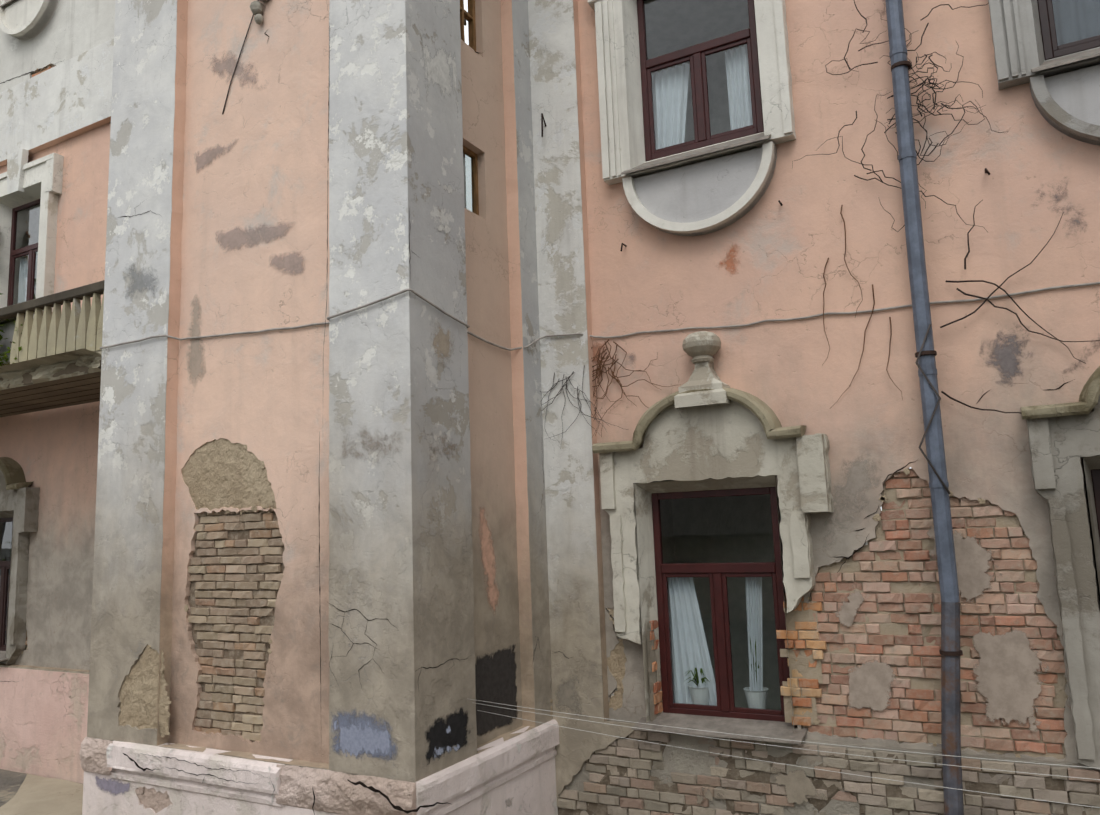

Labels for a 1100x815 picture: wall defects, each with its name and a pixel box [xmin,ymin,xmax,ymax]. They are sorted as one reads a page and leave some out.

spalling [119,645,171,737]
crack [123,753,275,791]
flaking render [182,438,285,742]
crack [319,437,395,688]
crack [347,779,451,814]
flaking render [776,468,941,747]
flaking render [949,490,1068,759]